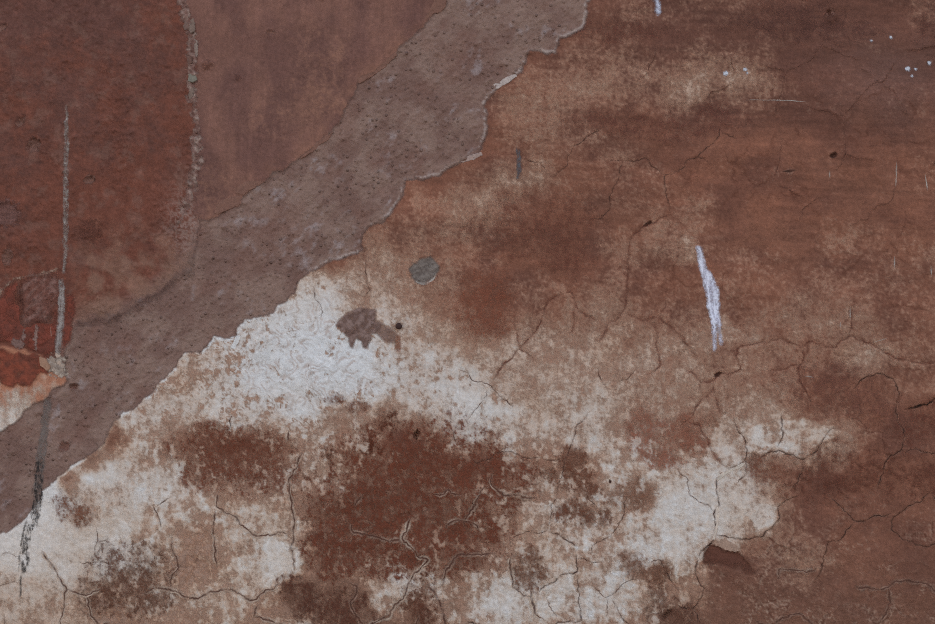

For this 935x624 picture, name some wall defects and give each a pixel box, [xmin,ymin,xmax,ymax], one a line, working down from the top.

spalling [0,0,589,533]
crack [628,129,732,252]
crack [42,552,107,624]
crack [158,543,285,624]
crack [211,432,302,568]
leakage [0,229,935,624]
crack [349,424,627,624]
crack [680,418,818,620]
crack [777,496,934,577]
crack [837,322,934,482]